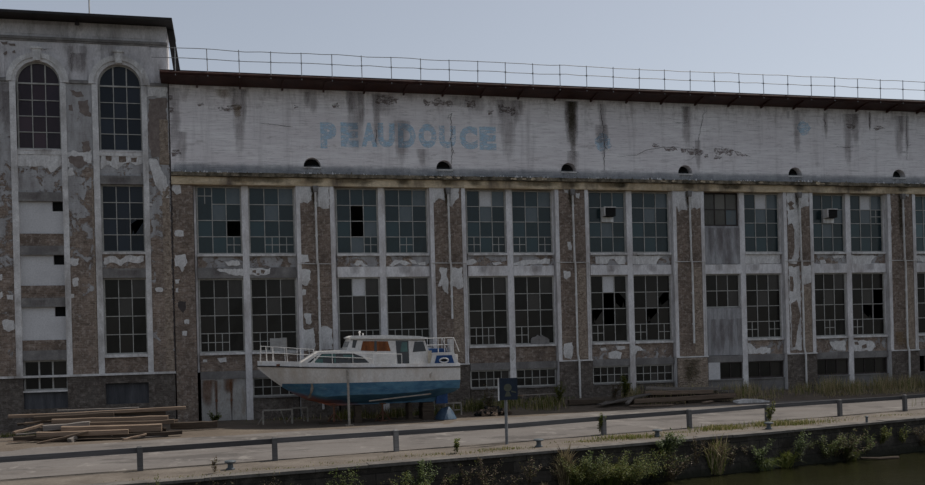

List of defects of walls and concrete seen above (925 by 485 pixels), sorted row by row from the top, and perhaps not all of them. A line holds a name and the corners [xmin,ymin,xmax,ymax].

spalling [18,86,189,373]
spalling [438,259,477,363]
peeling [748,343,771,354]
peeling [745,192,876,352]